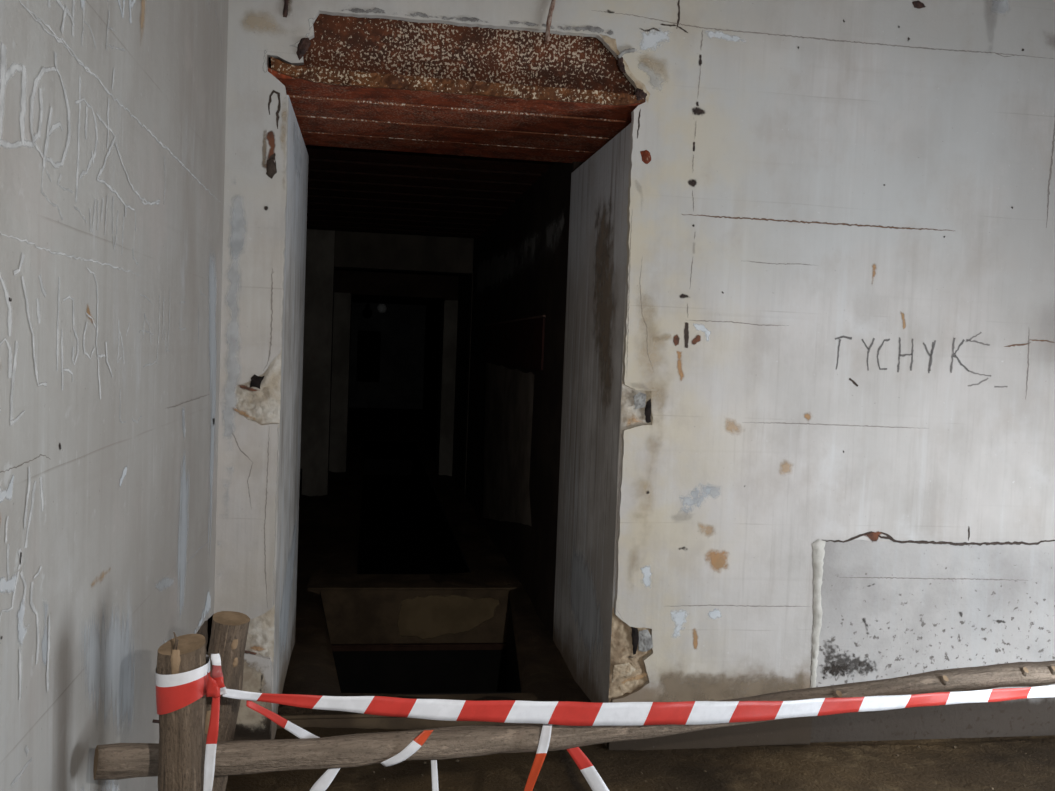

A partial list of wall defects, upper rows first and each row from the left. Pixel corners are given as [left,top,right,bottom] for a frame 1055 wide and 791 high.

corrosion [262,90,281,179]
corrosion [271,57,651,164]
spalling [234,349,282,428]
spalling [620,381,651,434]
corrosion [708,552,727,570]
crack [813,528,1055,546]
spalling [195,592,211,655]
spalling [236,605,275,729]
spalling [608,608,653,703]
mould [823,641,873,679]